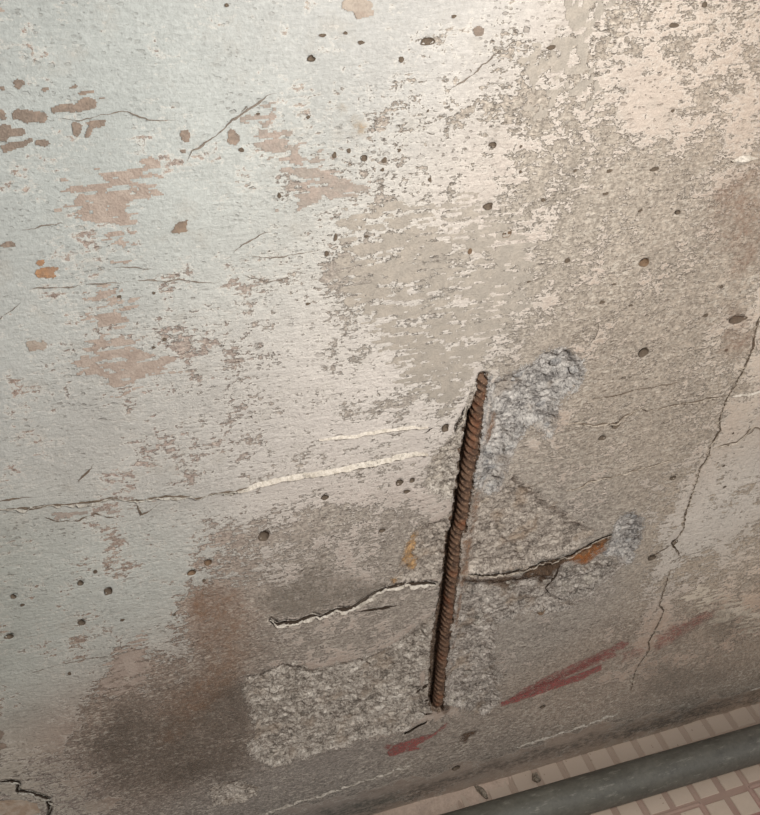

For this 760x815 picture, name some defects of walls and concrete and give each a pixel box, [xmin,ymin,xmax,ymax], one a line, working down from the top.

peeling [0,84,106,153]
peeling [227,128,240,145]
peeling [240,102,371,211]
crack [0,468,248,522]
peeling [241,191,645,768]
crack [566,317,760,689]
crack [461,534,613,597]
crack [270,581,436,629]
crack [0,780,53,815]